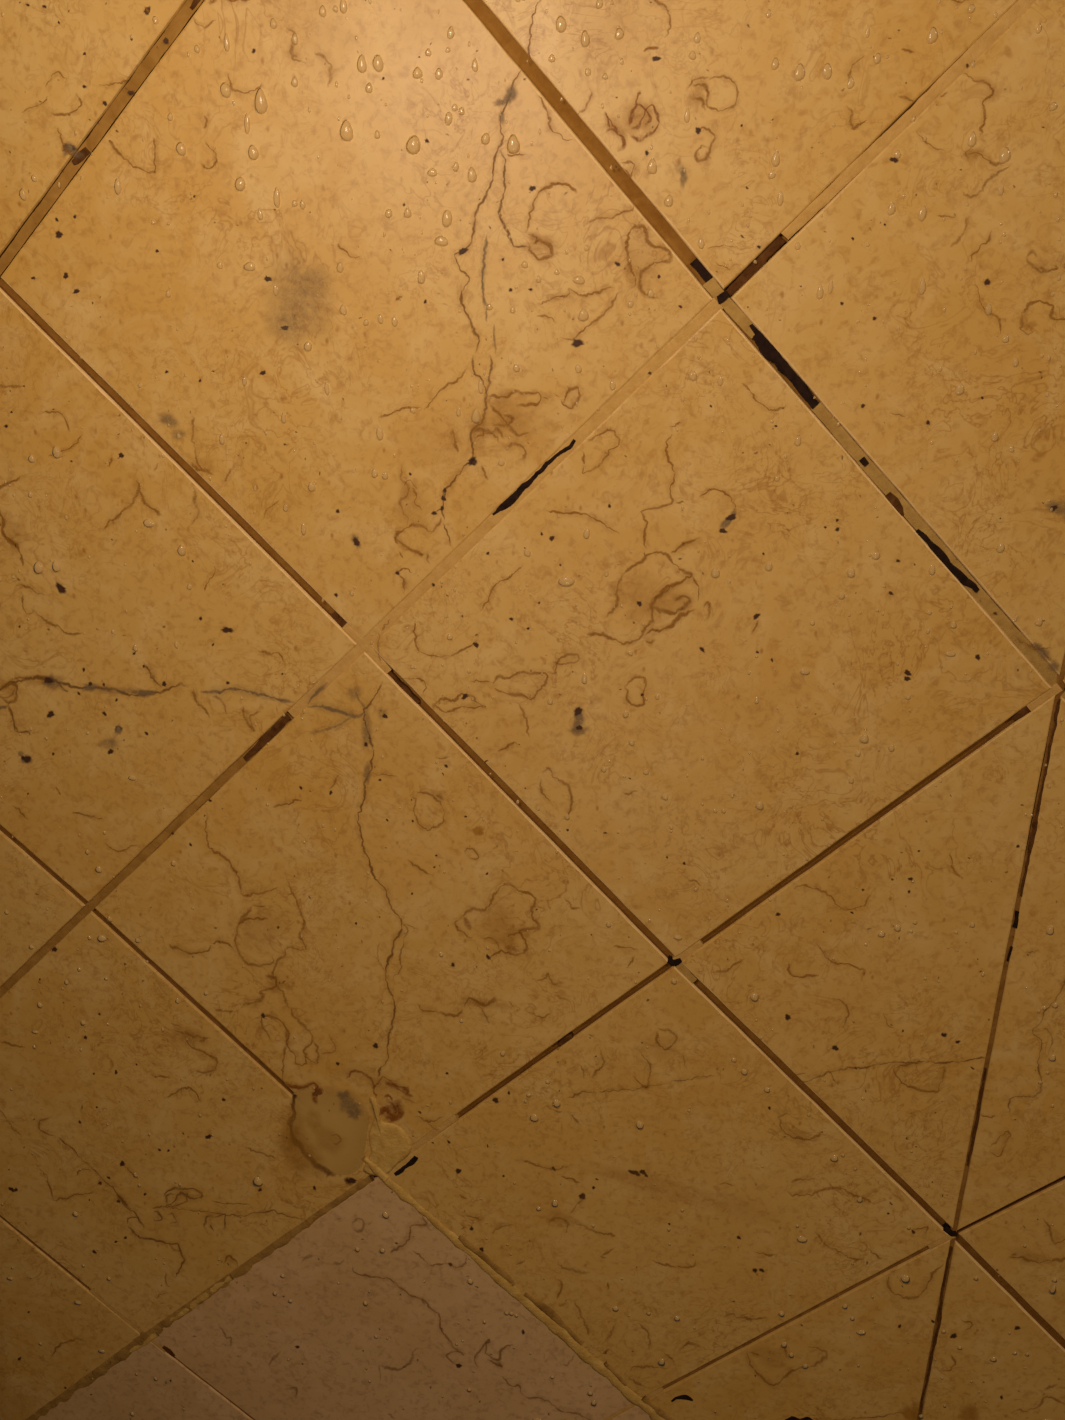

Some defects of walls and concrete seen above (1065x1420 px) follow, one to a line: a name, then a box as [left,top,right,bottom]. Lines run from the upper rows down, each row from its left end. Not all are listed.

crack [0,673,402,1075]